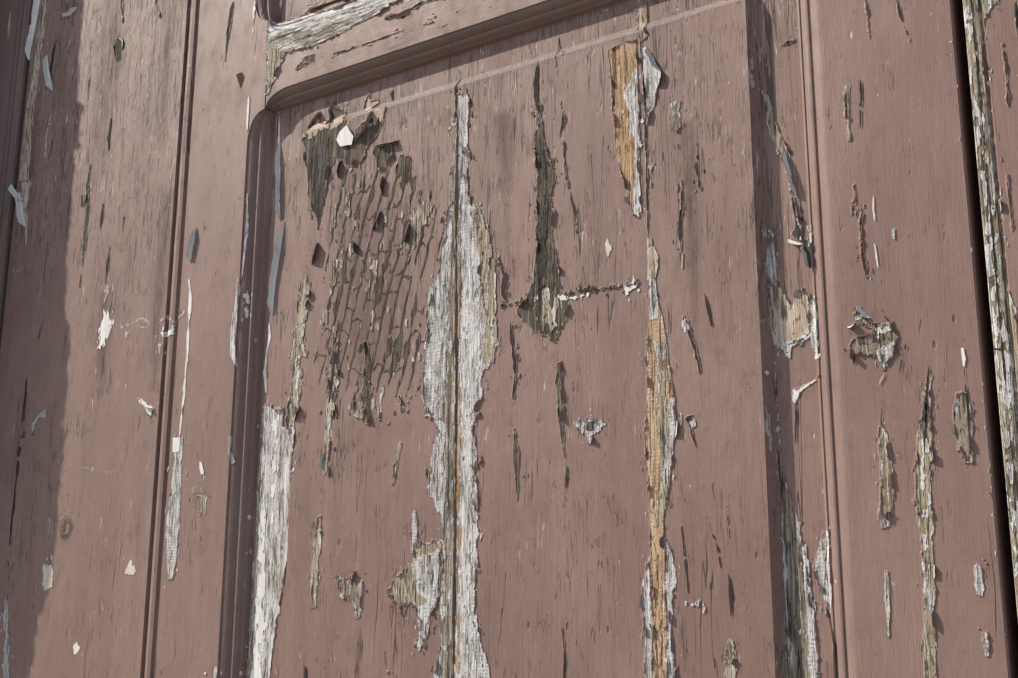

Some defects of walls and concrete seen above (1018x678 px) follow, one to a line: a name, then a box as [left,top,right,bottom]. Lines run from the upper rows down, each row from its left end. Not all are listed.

peeling [299,0,347,17]
peeling [8,0,58,247]
peeling [782,141,817,275]
crack [291,153,445,478]
peeling [760,277,821,359]
peeling [164,278,210,588]
peeling [791,374,821,441]
peeling [872,409,898,530]
peeling [911,352,939,678]
peeling [946,348,977,467]
peeling [386,538,443,655]
peeling [973,558,987,598]